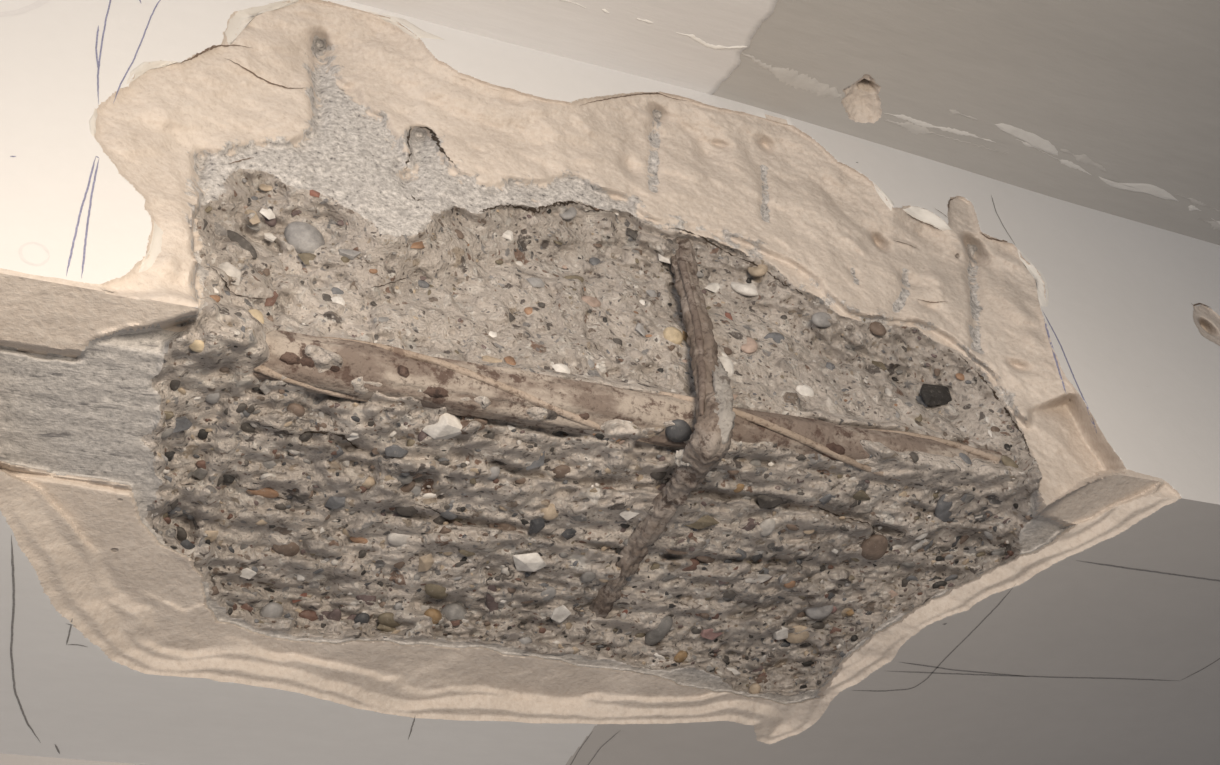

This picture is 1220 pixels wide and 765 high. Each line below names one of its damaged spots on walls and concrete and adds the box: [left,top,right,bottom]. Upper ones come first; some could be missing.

peeling [221,0,299,45]
peeling [347,0,778,95]
peeling [994,123,1058,155]
peeling [1099,177,1179,202]
peeling [903,206,952,231]
peeling [1017,249,1049,307]
spalling [304,345,343,373]
spalling [351,377,382,394]
spalling [347,611,373,628]
spalling [377,623,401,634]
spalling [806,621,831,630]
spalling [749,666,768,683]